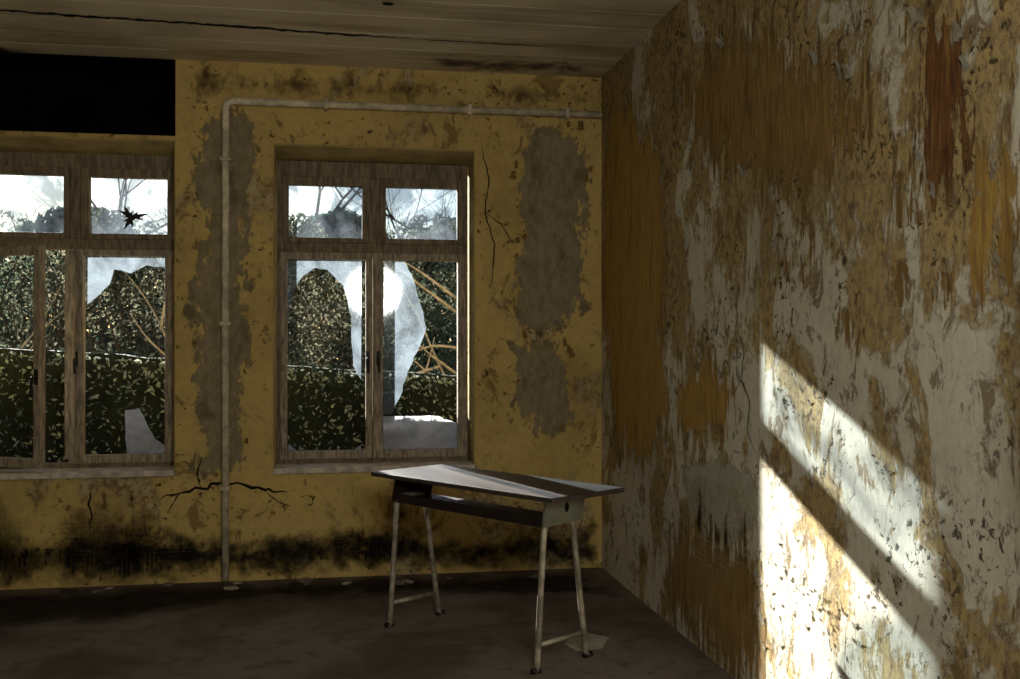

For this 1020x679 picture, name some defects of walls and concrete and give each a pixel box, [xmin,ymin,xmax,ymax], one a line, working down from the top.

peeling [891,4,1020,312]
peeling [183,104,261,481]
peeling [835,306,854,349]
peeling [886,262,908,307]
crack [161,460,289,511]
peeling [658,482,861,679]